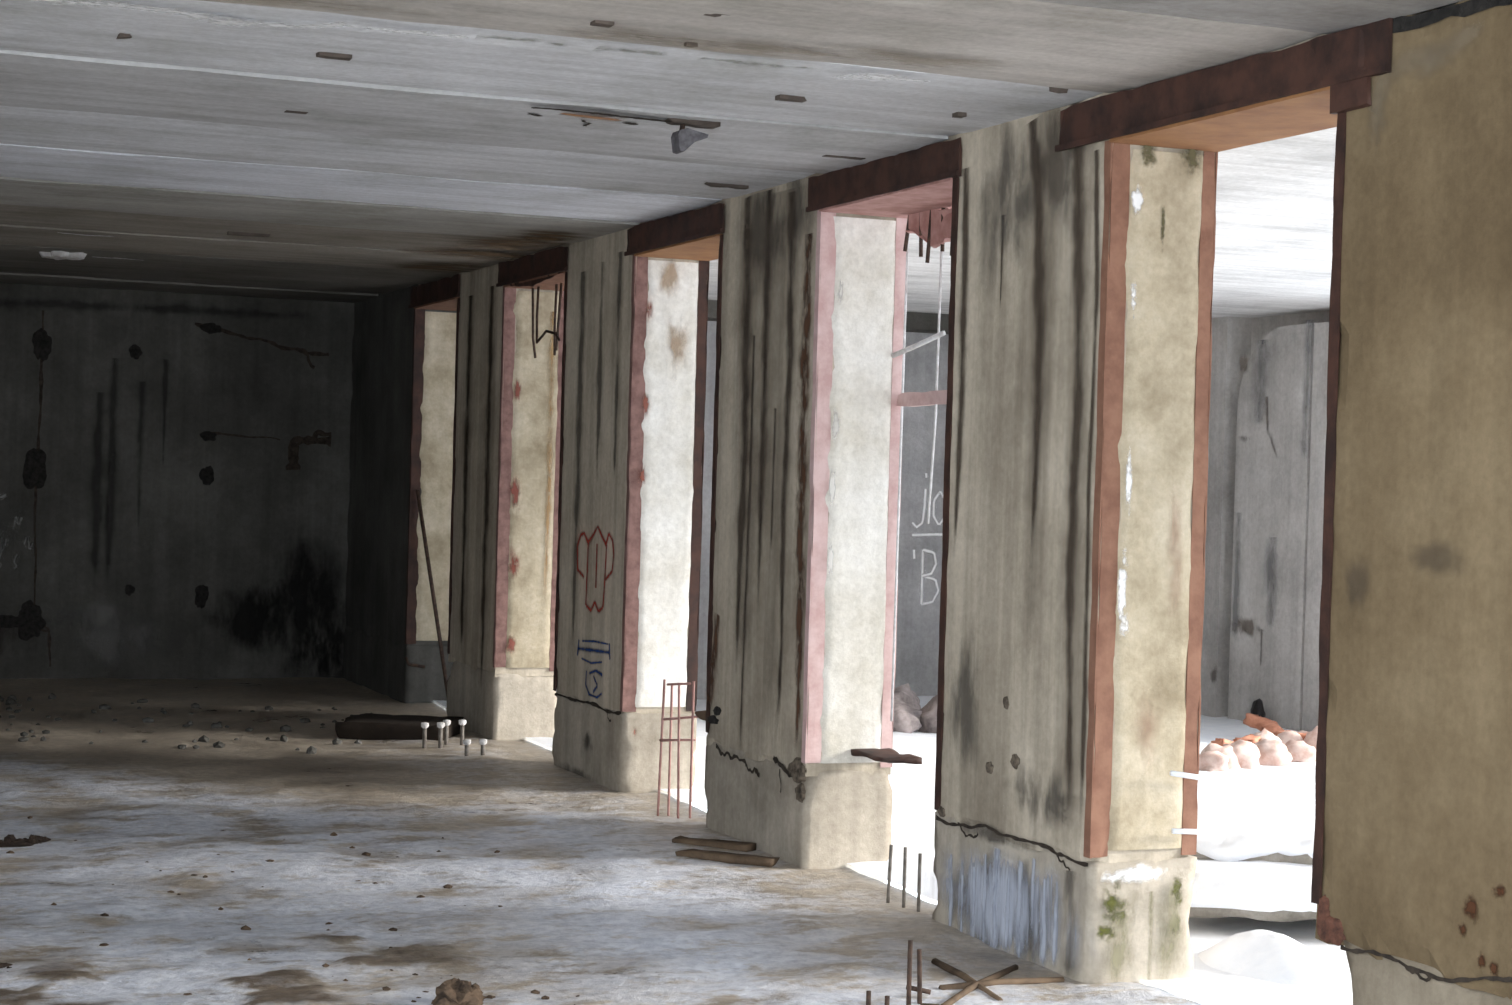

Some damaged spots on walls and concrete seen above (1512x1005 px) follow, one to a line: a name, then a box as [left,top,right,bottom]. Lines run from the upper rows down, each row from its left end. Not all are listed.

damp [955,168,968,530]
damp [573,252,622,628]
damp [998,118,1098,817]
damp [223,544,343,678]
crack [716,744,792,793]
damp [955,660,973,747]
damp [946,828,1072,970]
crack [936,815,1088,871]
crack [1340,945,1512,983]